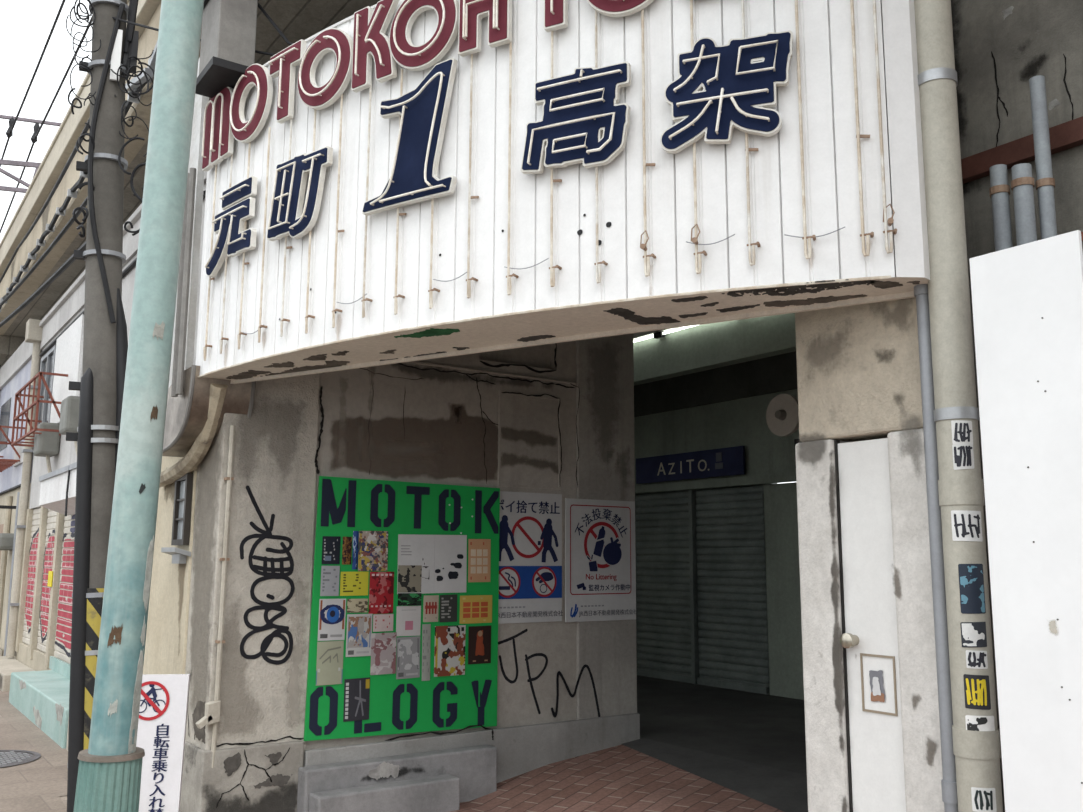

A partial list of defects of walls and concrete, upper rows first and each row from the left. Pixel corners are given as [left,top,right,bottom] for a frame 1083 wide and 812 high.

crack [991,51,1008,147]
crack [1063,54,1074,120]
peeling [226,351,350,379]
peeling [380,328,470,361]
crack [315,386,324,474]
damp [331,404,558,480]
crack [360,344,580,486]
damp [799,436,846,750]
crack [216,736,304,808]